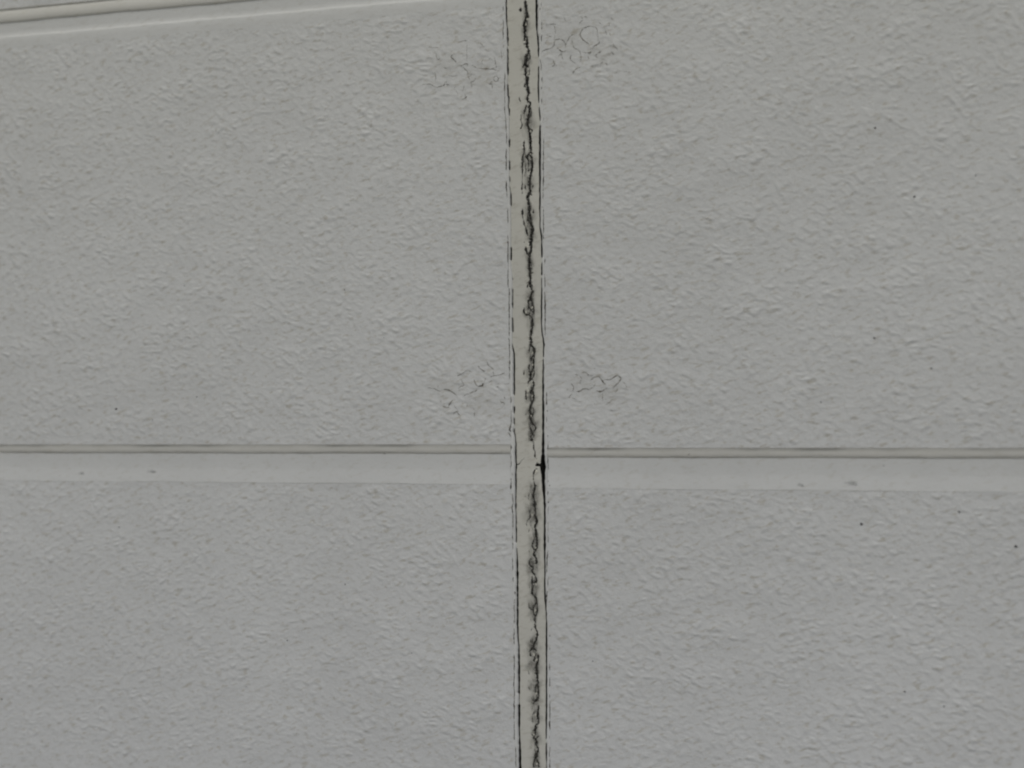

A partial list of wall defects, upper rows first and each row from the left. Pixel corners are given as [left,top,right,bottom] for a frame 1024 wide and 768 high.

crack [424,0,631,768]